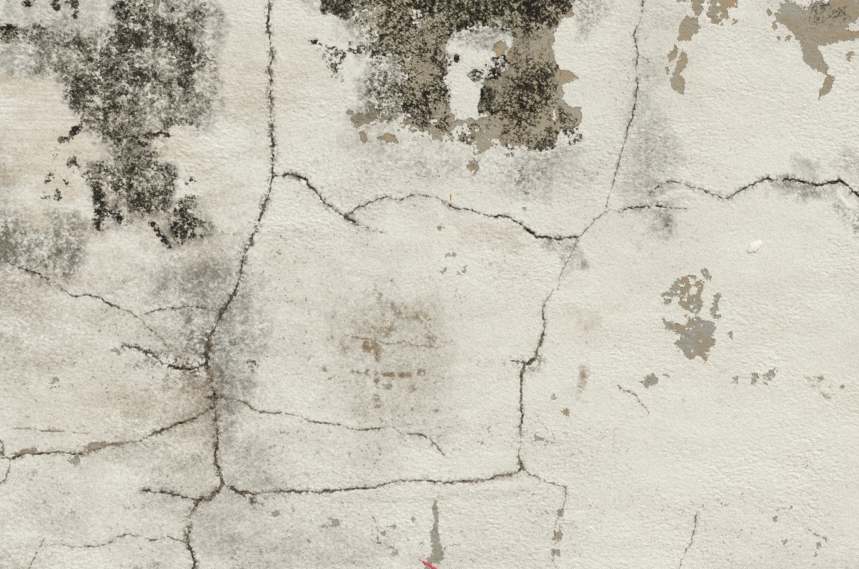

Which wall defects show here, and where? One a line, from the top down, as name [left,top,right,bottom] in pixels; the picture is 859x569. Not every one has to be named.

damp [311,0,582,156]
peeling [346,0,583,174]
peeling [665,0,738,95]
peeling [767,0,859,99]
damp [0,0,218,277]
crack [650,176,859,199]
crack [0,0,686,569]
peeling [661,268,721,361]
peeling [419,500,443,569]